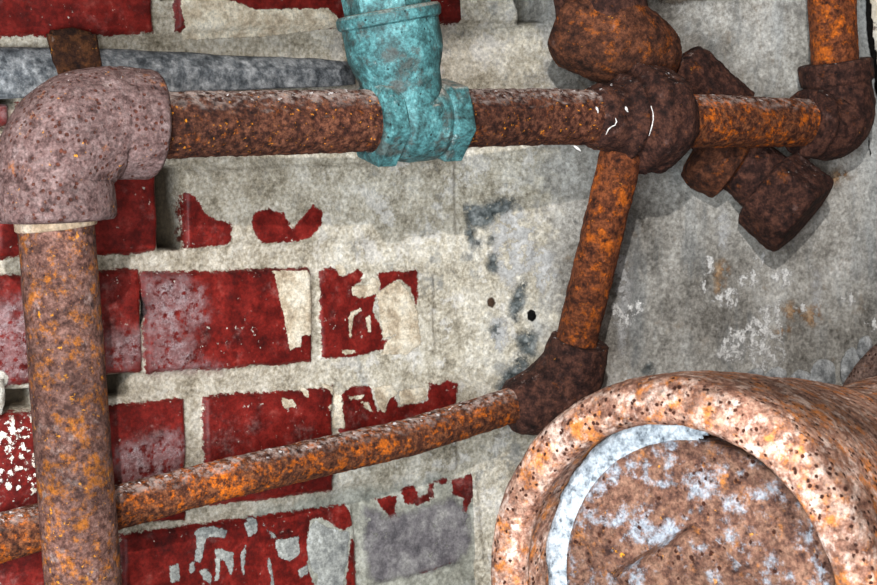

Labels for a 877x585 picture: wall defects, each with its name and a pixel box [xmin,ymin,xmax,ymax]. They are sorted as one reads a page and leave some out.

peeling [180,0,338,40]
peeling [272,270,312,350]
peeling [169,517,350,585]